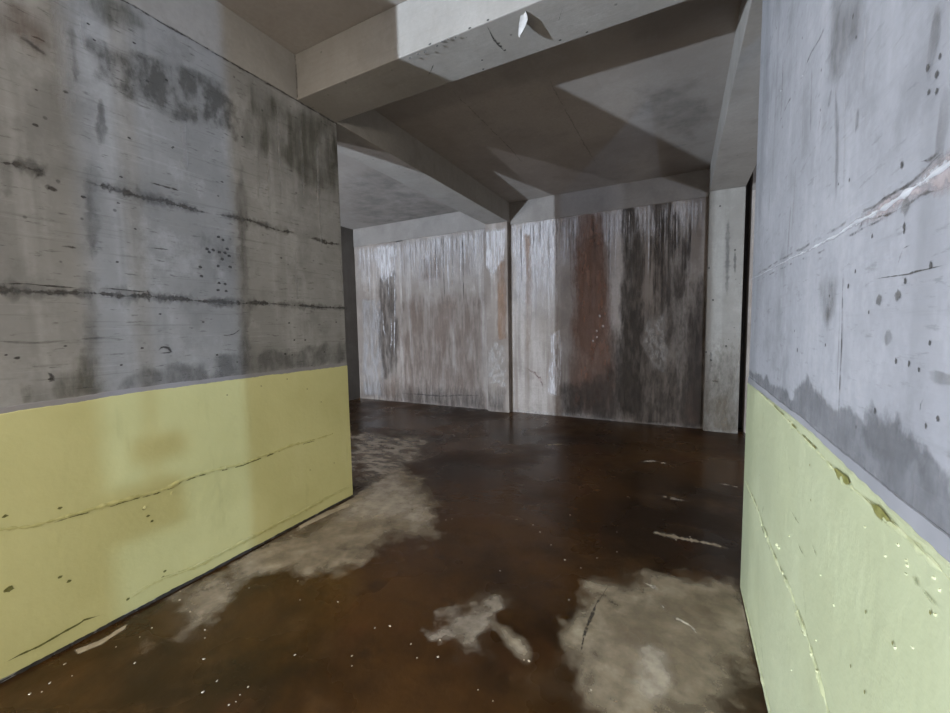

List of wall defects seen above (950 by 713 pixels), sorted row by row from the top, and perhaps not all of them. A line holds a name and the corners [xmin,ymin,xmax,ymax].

water stain [121,55,230,129]
water stain [368,246,397,377]
water stain [462,219,581,271]
corrosion [571,214,615,410]
water stain [550,202,738,432]
crack [753,161,950,279]
water stain [239,434,434,574]
water stain [752,375,946,530]
peeling [757,390,950,592]
crack [12,616,96,659]
crack [581,588,607,649]
water stain [564,577,748,713]